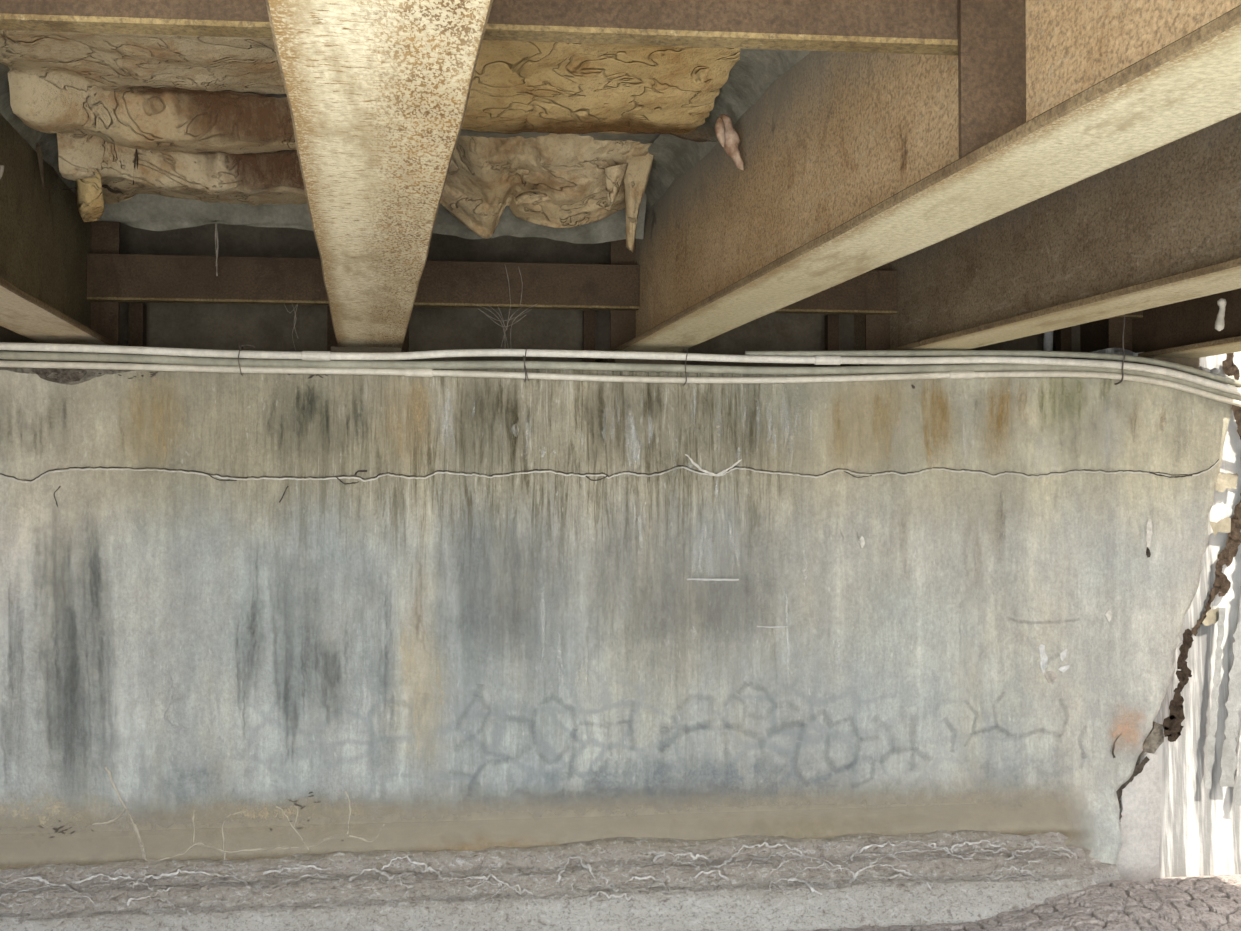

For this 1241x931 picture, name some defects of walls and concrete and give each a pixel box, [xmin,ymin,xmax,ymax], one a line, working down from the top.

crack [0,353,1241,507]
crack [1112,493,1241,822]